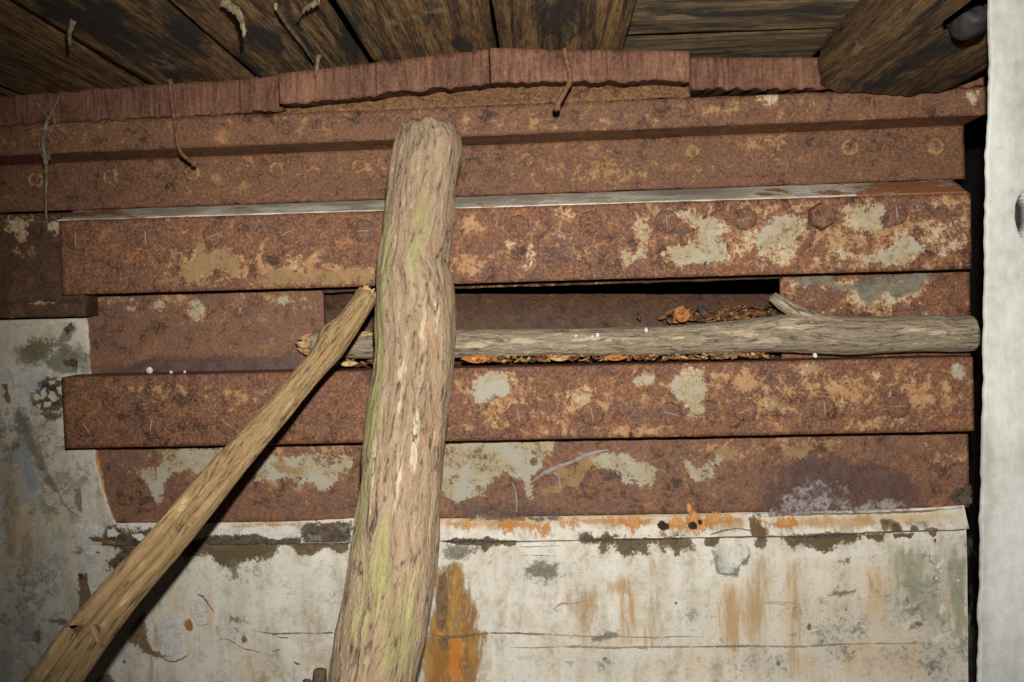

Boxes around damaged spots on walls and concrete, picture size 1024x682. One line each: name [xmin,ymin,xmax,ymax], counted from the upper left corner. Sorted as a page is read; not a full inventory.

corrosion [283,82,690,113]
mould [15,323,78,374]
water stain [182,523,350,579]
corrosion [490,503,741,538]
water stain [578,532,720,557]
water stain [748,517,768,549]
water stain [781,531,915,563]
corrosion [422,562,487,682]